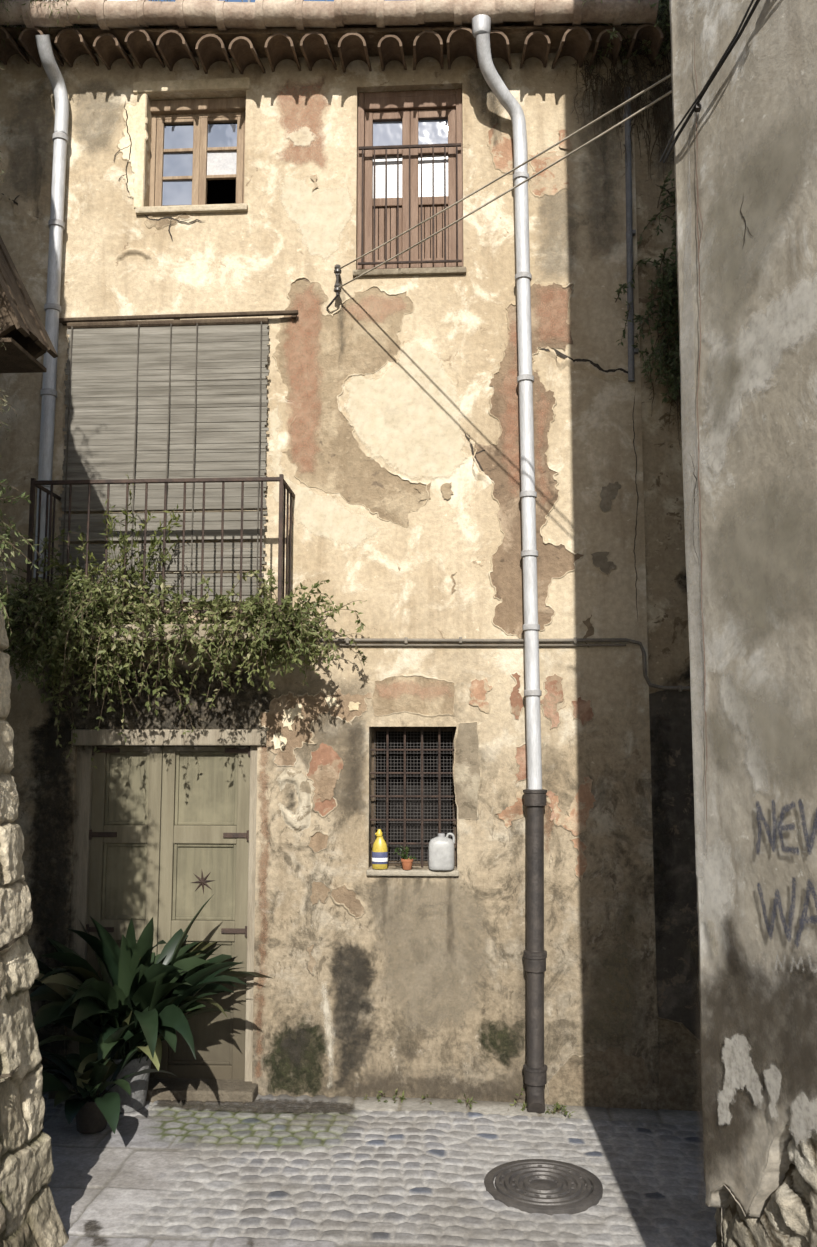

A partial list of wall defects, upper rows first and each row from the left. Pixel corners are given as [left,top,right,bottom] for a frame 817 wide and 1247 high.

crack [114,100,200,241]
spalling [278,79,326,191]
spalling [272,276,453,528]
spalling [472,282,617,639]
crack [538,346,638,618]
spalling [258,673,493,854]
spalling [495,743,527,829]
spalling [509,671,525,721]
spalling [540,673,595,730]
spalling [546,776,597,883]
leakage [700,843,817,1165]
spalling [545,1033,817,1247]